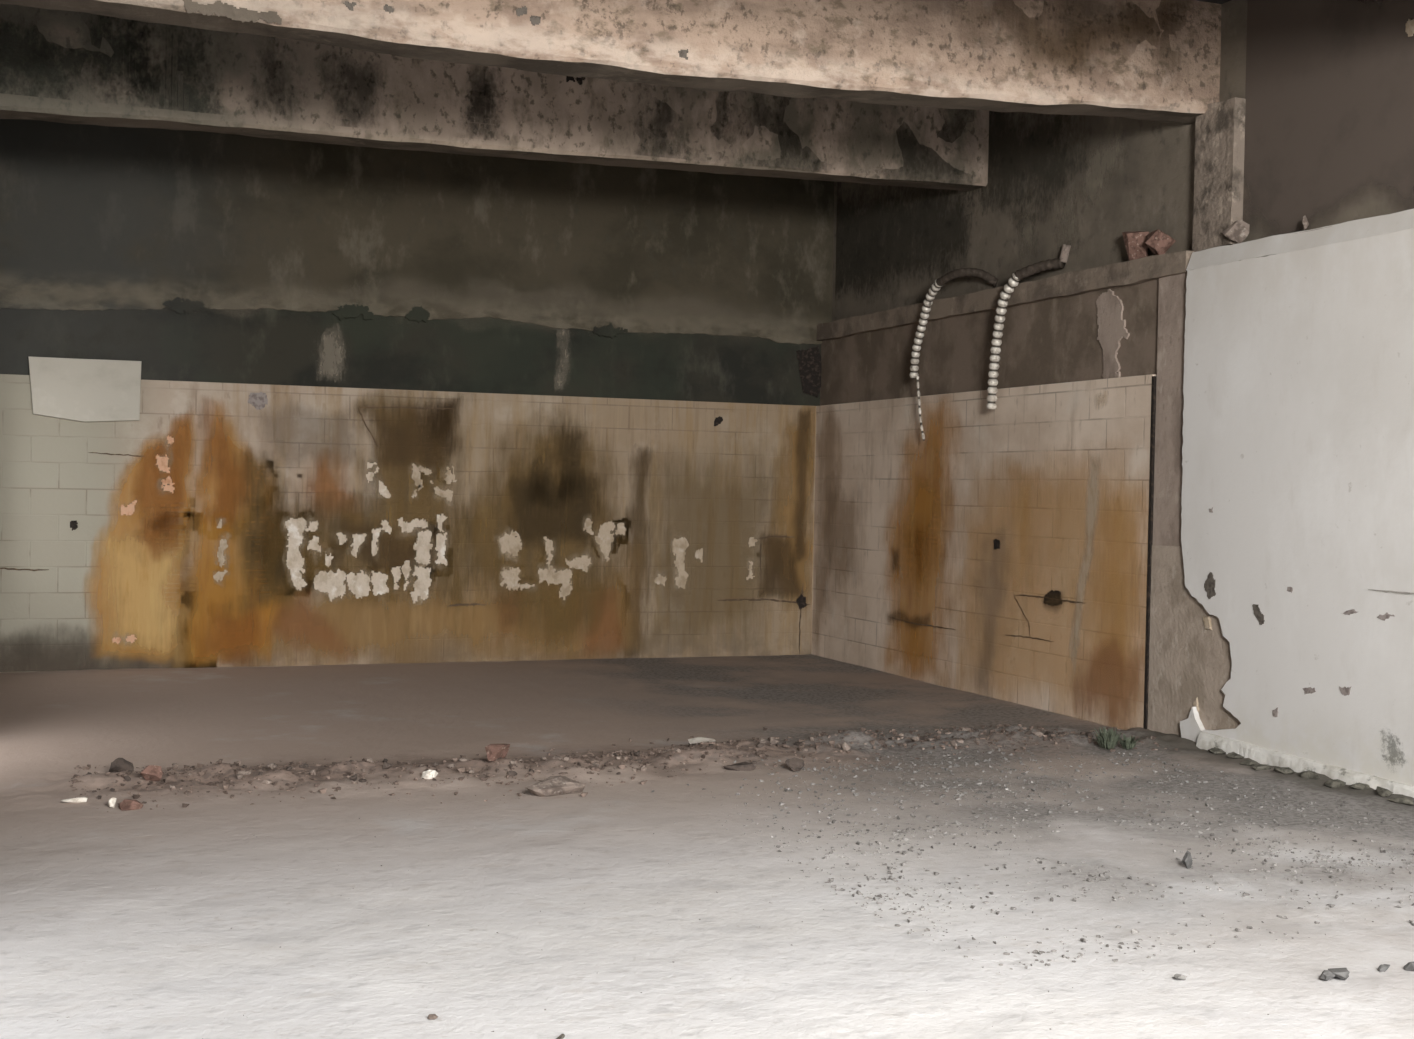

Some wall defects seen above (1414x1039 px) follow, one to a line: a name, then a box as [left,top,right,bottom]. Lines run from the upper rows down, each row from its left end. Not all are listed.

damp [0,17,219,114]
peeling [1405,19,1414,37]
damp [751,109,823,170]
damp [318,327,345,379]
rust [95,413,277,659]
rust [315,465,353,513]
peeling [284,462,457,604]
damp [231,399,648,659]
peeling [499,518,626,600]
rust [890,412,944,665]
flaking render [1147,545,1241,737]